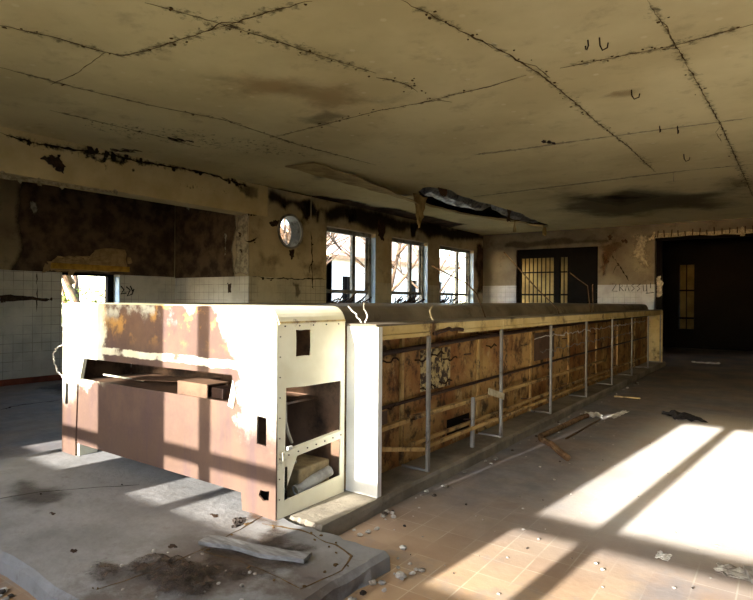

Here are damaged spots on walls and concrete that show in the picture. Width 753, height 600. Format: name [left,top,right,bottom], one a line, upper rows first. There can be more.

crack [0,0,753,197]
spalling [40,155,66,174]
spalling [42,248,132,276]
peeling [235,214,249,274]
spalling [621,226,753,266]